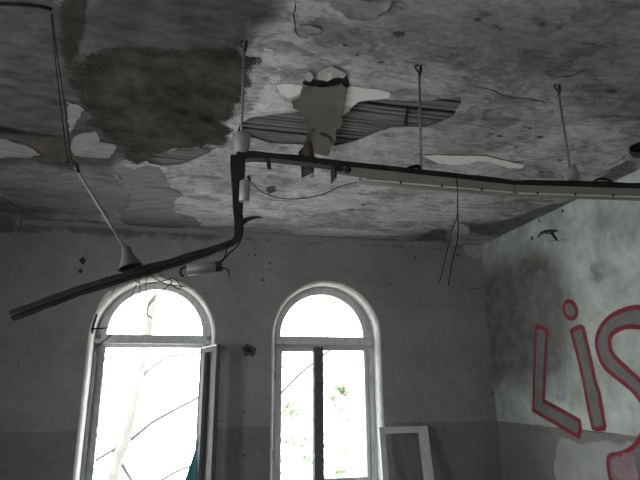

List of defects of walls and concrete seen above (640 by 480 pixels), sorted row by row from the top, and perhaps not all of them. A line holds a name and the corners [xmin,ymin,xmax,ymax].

crack [293,0,309,39]
peeling [0,139,39,158]
peeling [67,102,116,158]
damp [58,0,262,165]
flaking render [113,148,215,228]
flaking render [301,166,314,182]
flaking render [238,66,461,157]
peeling [422,154,525,169]
crack [459,85,553,104]
damp [484,262,564,383]
peeling [553,430,634,480]